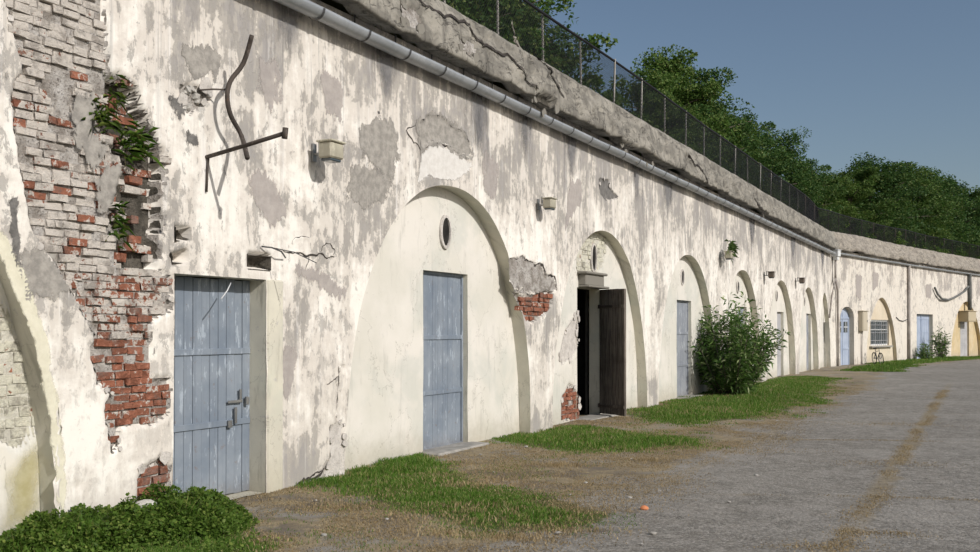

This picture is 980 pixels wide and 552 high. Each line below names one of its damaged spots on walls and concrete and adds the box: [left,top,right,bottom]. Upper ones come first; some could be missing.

peeling [168,42,221,120]
crack [420,0,564,97]
flaking render [186,130,199,146]
crack [406,110,473,157]
flaking render [415,110,499,199]
crack [689,155,708,182]
flaking render [0,0,188,510]
crack [283,243,335,270]
flaking render [508,256,557,331]
flaking render [561,384,582,421]